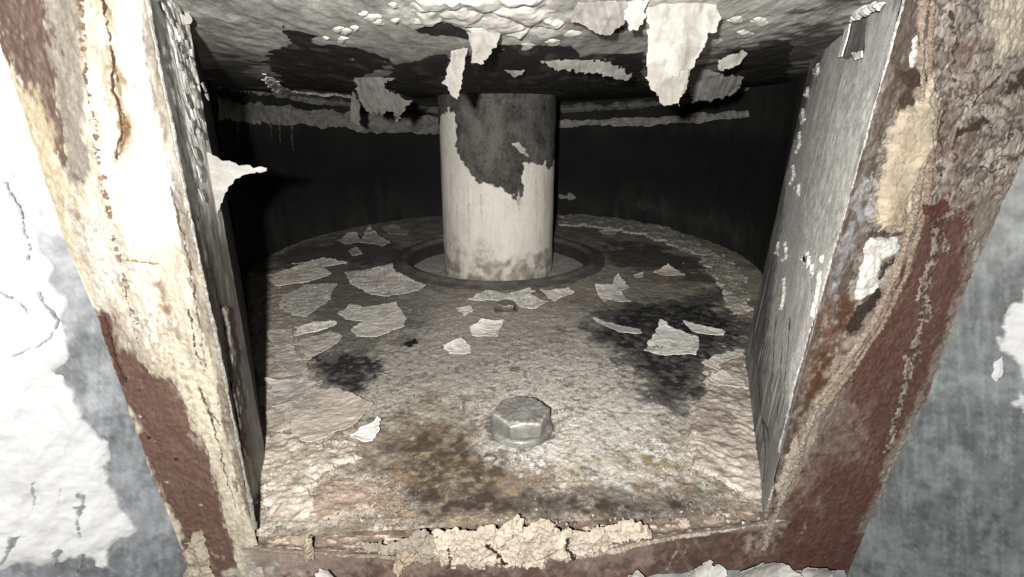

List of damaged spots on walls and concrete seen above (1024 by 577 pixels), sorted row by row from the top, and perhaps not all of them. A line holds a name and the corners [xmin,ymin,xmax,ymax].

peeling [838,1,886,60]
crack [101,0,130,159]
peeling [160,0,793,213]
peeling [558,214,755,315]
spalling [845,236,901,333]
peeling [443,287,575,354]
peeling [246,224,425,522]
rust [799,350,831,415]
leakage [72,494,84,537]
leakage [409,489,524,514]
leakage [540,499,630,514]
leakage [0,537,18,565]